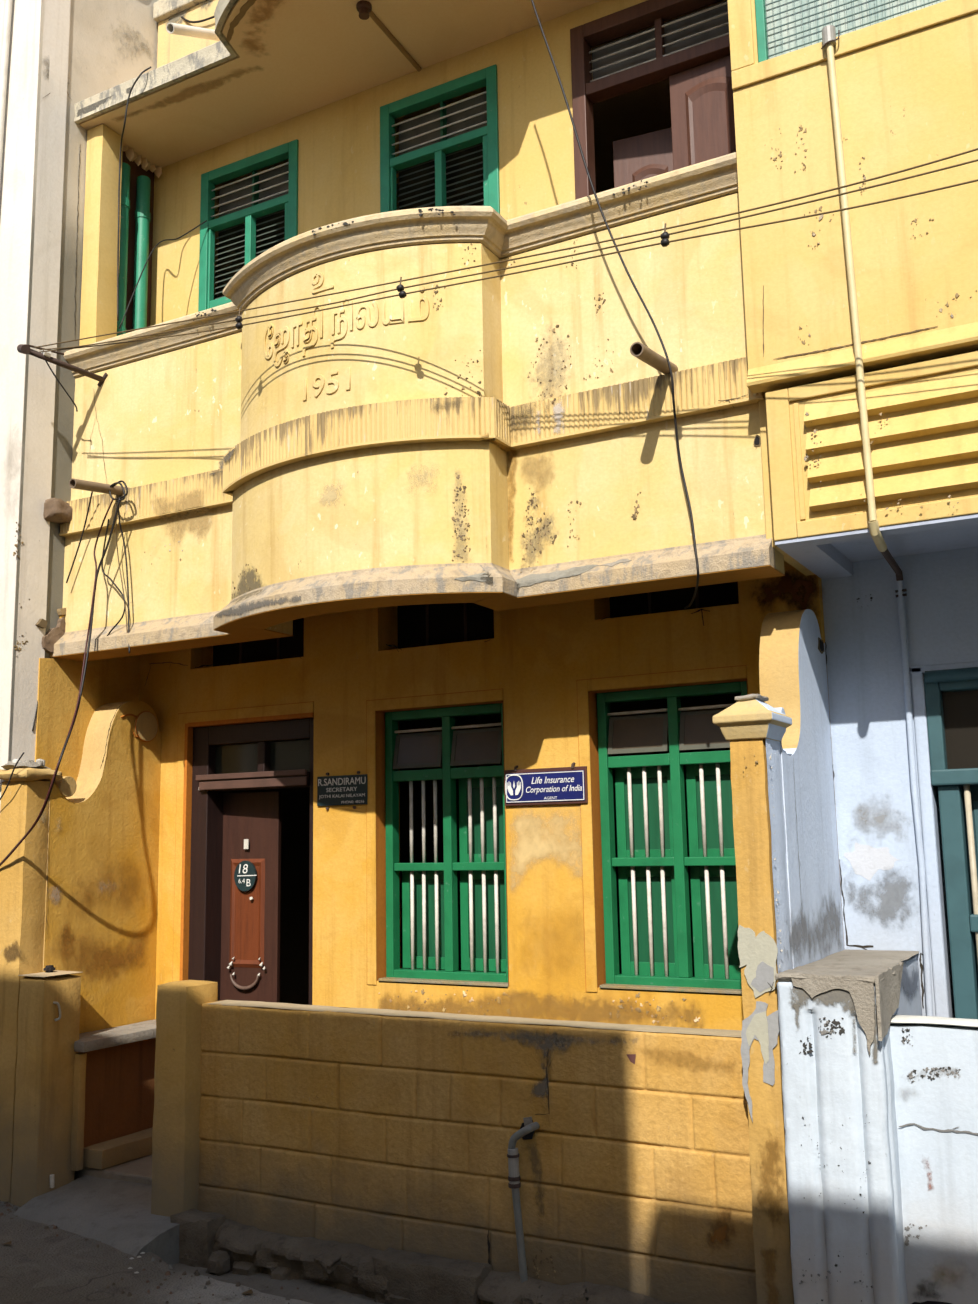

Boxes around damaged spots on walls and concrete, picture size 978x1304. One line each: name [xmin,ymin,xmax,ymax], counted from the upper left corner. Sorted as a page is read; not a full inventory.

damp [515,402,564,433]
damp [483,434,549,554]
damp [789,872,910,953]
damp [61,927,142,974]
damp [901,964,919,997]
peeling [610,993,700,1024]
peeling [738,888,783,1122]
damp [381,993,693,1097]
flaking render [799,1017,845,1054]
crack [899,1123,978,1135]